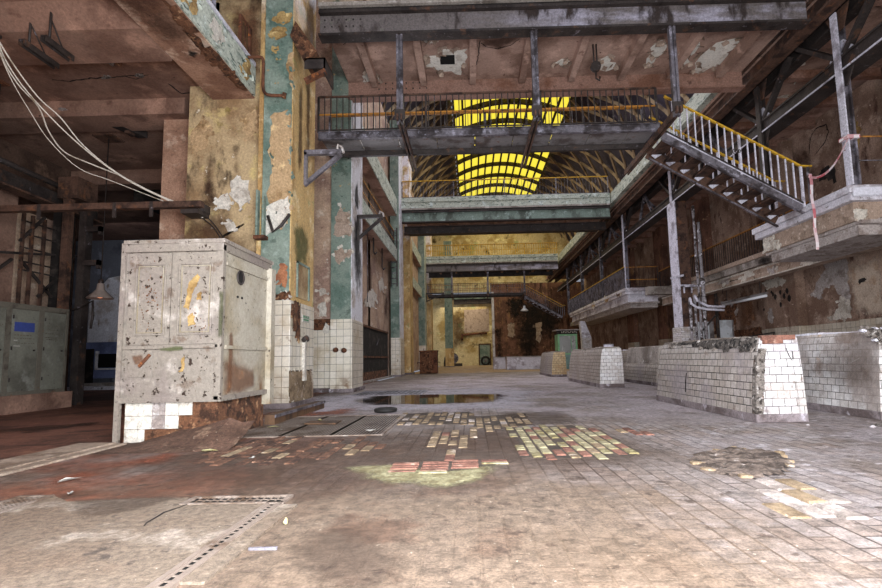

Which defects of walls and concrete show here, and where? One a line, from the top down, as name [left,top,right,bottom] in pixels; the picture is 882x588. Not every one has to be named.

spalling [162,0,254,91]
peeling [683,37,719,75]
peeling [213,175,251,232]
peeling [261,108,295,236]
peeling [800,259,866,322]
spalling [669,264,795,414]